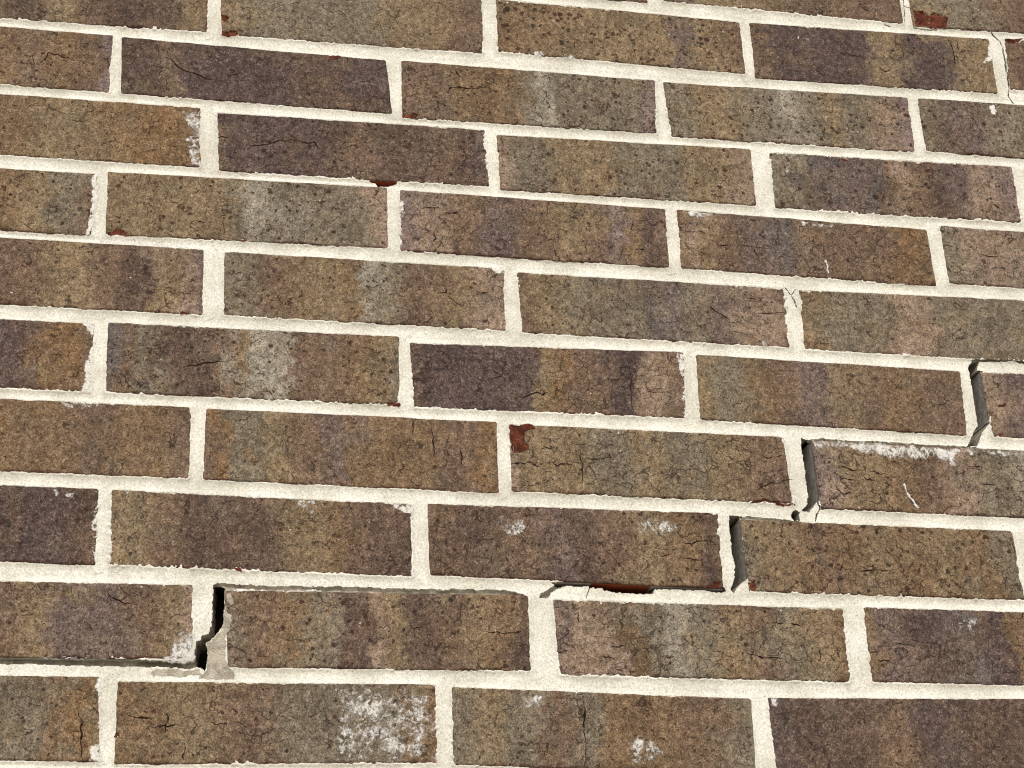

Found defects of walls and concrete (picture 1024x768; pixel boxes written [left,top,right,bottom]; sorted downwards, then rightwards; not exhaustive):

water stain [183,111,202,167]
crack [968,359,1024,380]
water stain [813,440,973,466]
crack [659,417,996,593]
crack [0,581,593,671]
water stain [339,690,433,759]